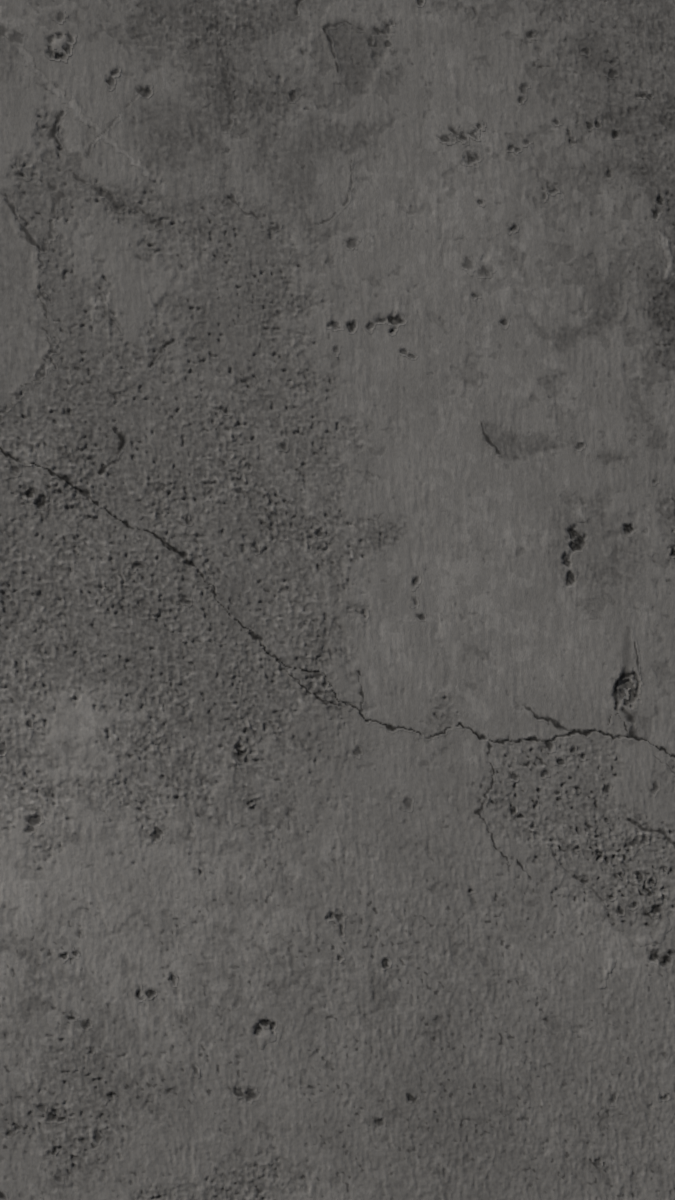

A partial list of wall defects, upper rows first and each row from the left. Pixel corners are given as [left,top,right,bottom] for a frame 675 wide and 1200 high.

crack [0,423,675,882]